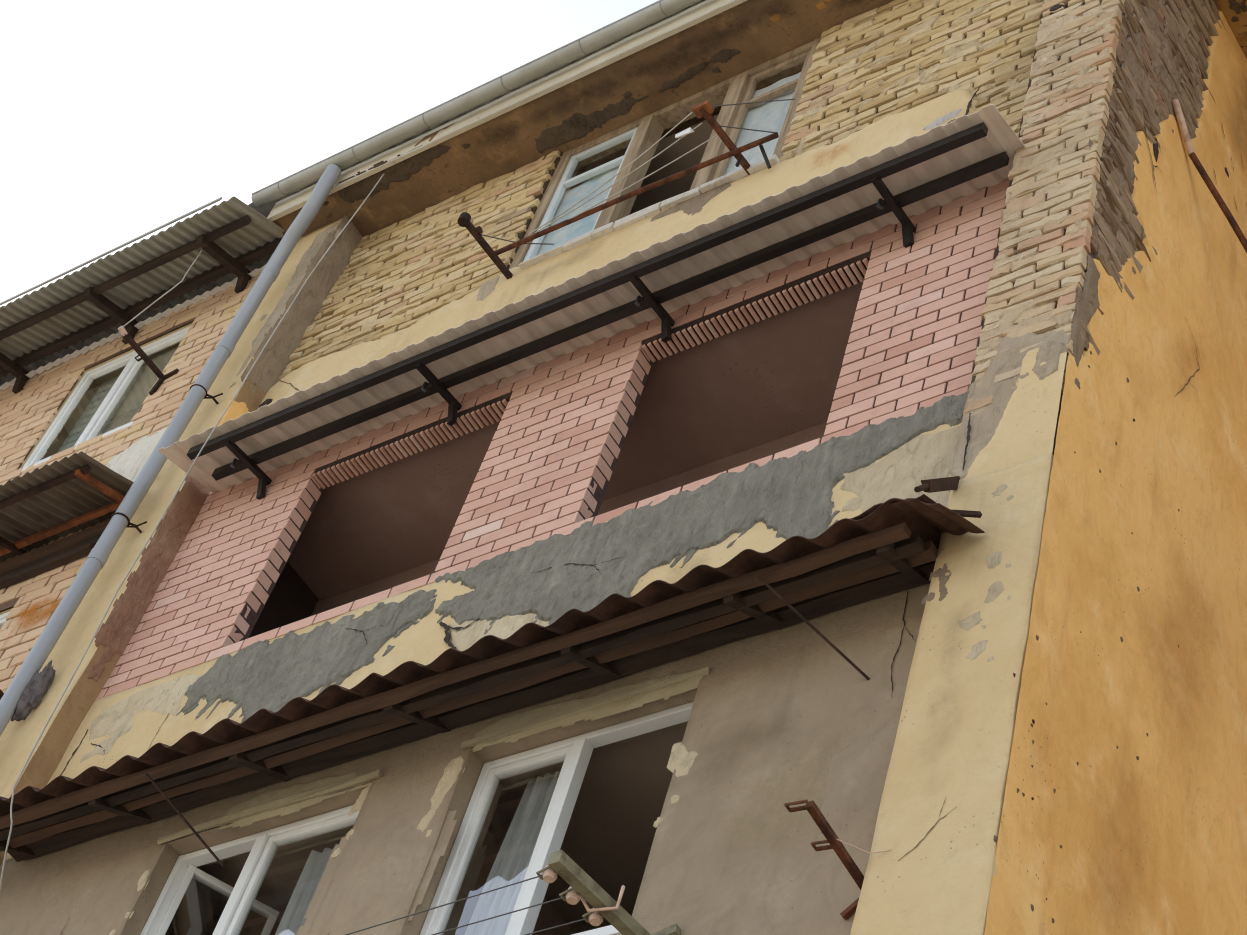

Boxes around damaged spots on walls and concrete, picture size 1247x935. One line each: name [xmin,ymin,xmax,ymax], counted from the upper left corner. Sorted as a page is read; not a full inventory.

flaking render [1019,0,1247,389]
crack [1177,317,1203,395]
peeling [840,426,960,514]
flaking render [87,473,210,682]
flaking render [921,563,952,604]
flaking render [450,614,549,651]
crack [891,591,914,697]
peeling [80,674,201,763]